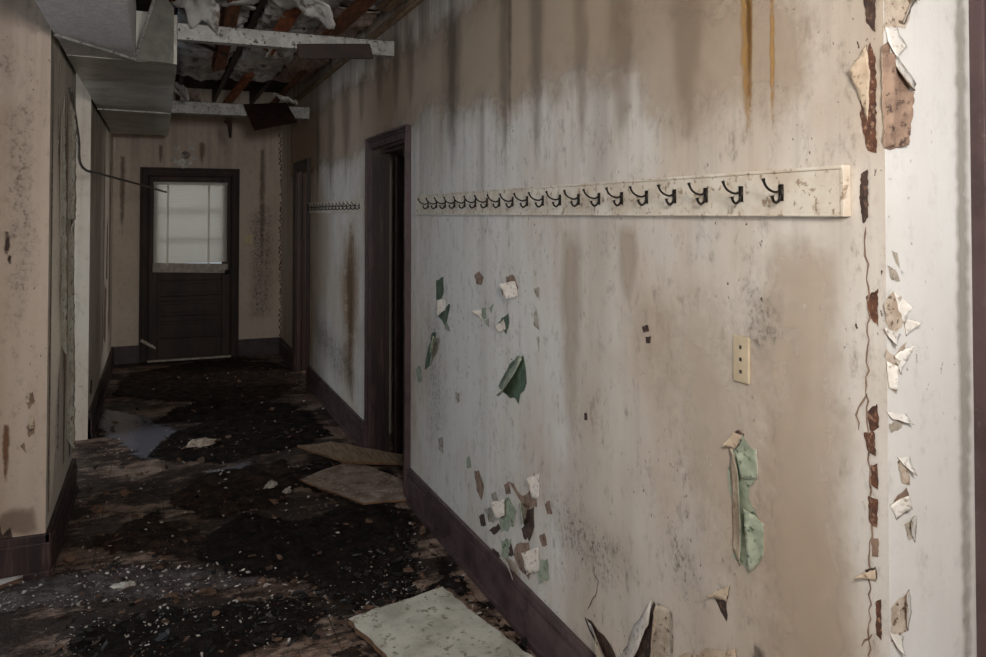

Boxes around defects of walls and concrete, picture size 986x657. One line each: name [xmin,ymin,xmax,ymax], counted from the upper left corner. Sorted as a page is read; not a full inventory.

damp [291,0,799,176]
peeling [849,0,920,153]
peeling [859,169,869,223]
damp [317,231,354,383]
peeling [416,277,450,383]
peeling [497,355,527,404]
peeling [866,250,923,394]
peeling [467,456,552,584]
peeling [722,430,765,573]
peeling [853,404,917,581]
peeling [584,600,736,657]
peeling [875,590,912,656]